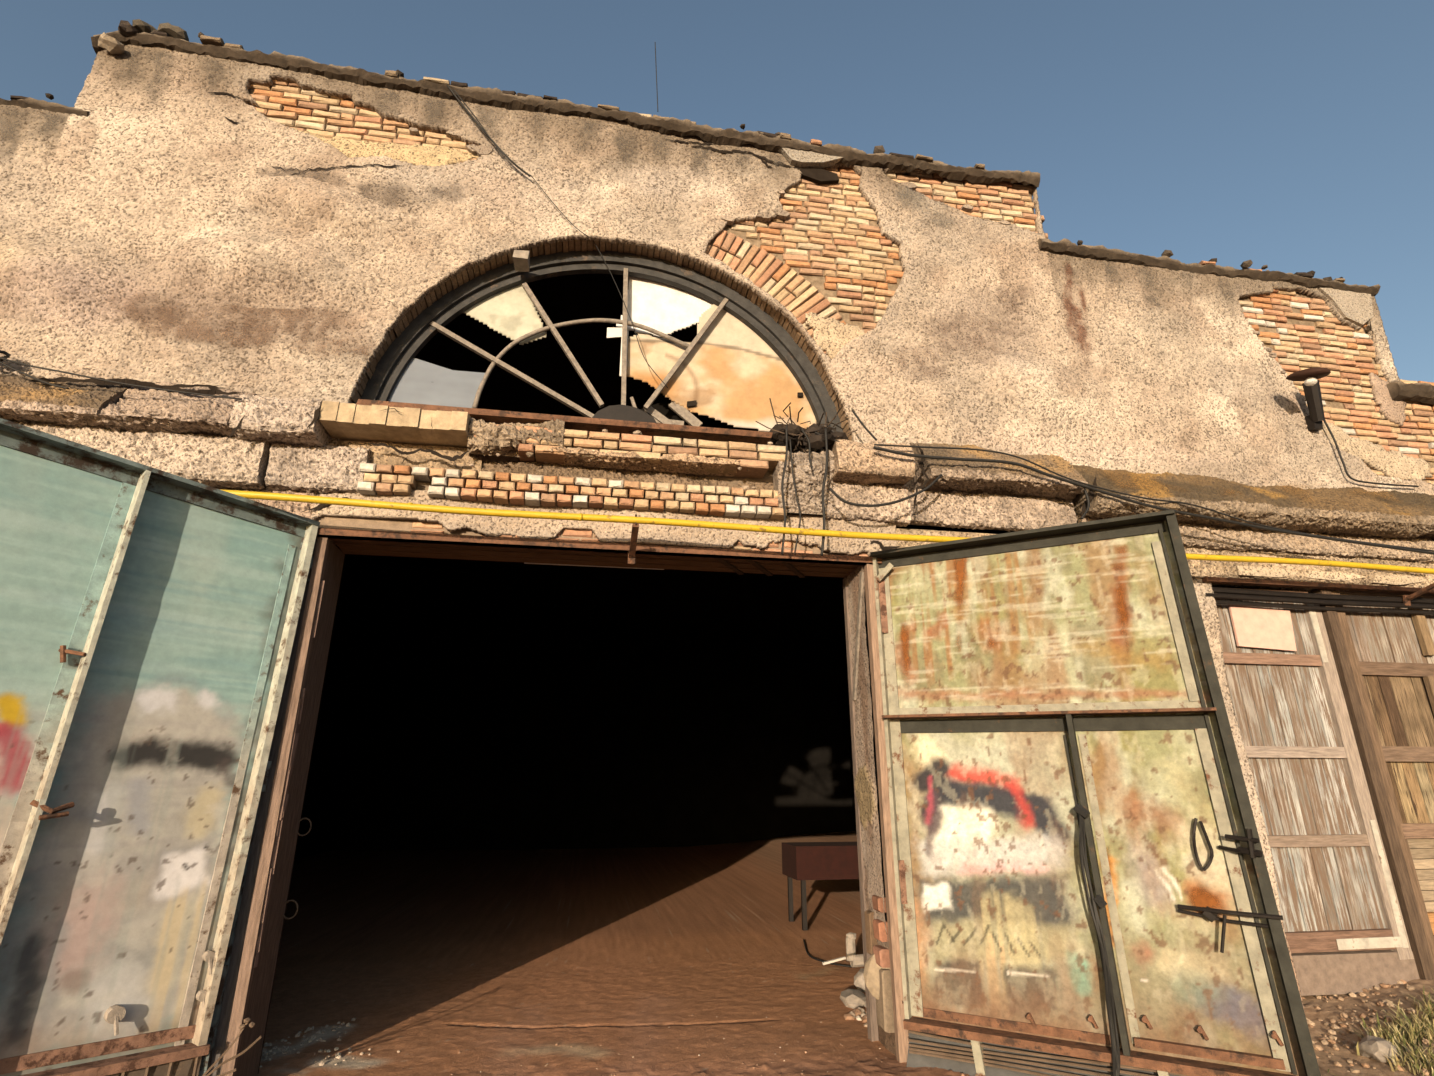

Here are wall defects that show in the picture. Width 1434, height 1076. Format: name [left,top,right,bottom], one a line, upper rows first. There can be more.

spalling [250,80,493,166]
spalling [885,172,1048,239]
spalling [706,148,904,360]
corrosion [1064,270,1086,343]
spalling [1238,288,1434,484]
corrosion [954,558,967,604]
corrosion [1116,587,1128,625]
corrosion [901,626,909,671]